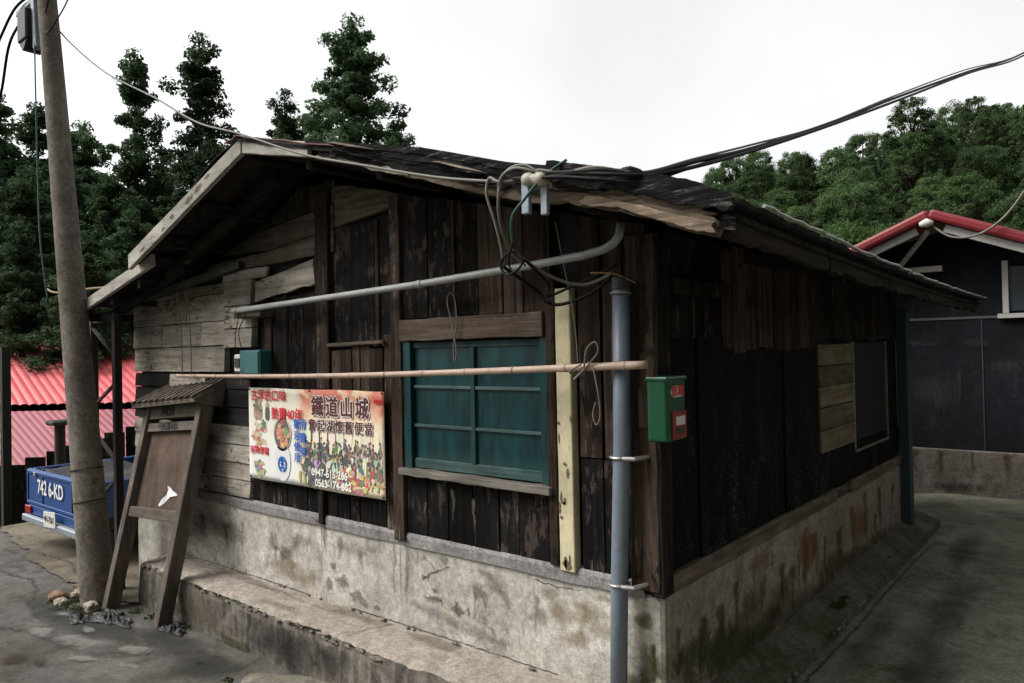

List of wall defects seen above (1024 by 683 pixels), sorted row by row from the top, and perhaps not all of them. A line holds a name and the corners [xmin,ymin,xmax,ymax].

crack [148,554,558,675]
damp [422,575,479,616]